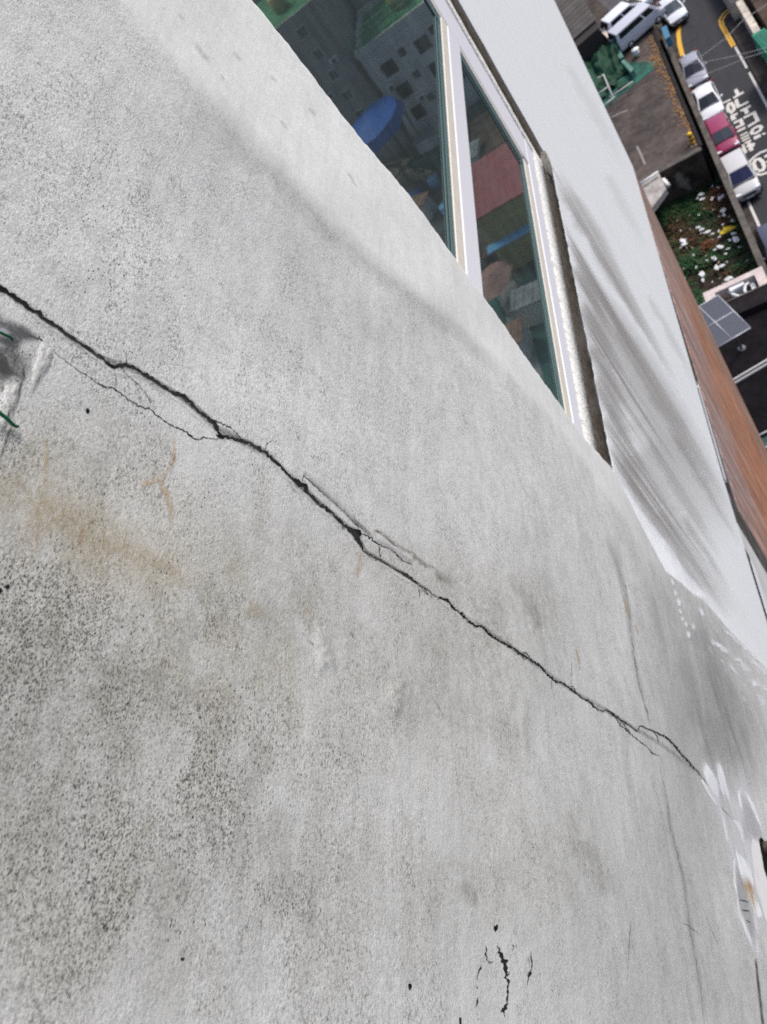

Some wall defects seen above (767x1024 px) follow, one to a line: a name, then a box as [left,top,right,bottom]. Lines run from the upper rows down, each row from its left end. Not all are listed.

spalling [0,320,37,395]
crack [0,285,733,819]
crack [476,944,533,1016]